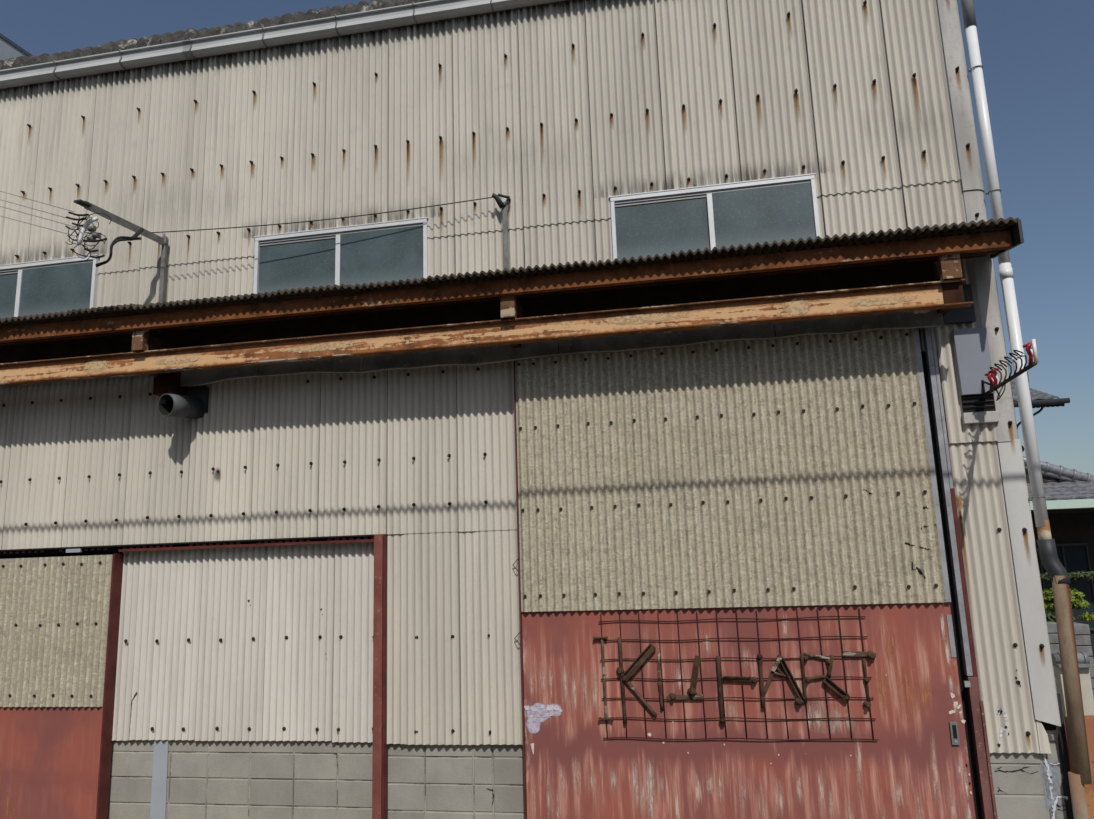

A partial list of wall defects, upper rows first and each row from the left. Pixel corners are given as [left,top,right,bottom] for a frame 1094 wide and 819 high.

peeling [524,665,597,754]